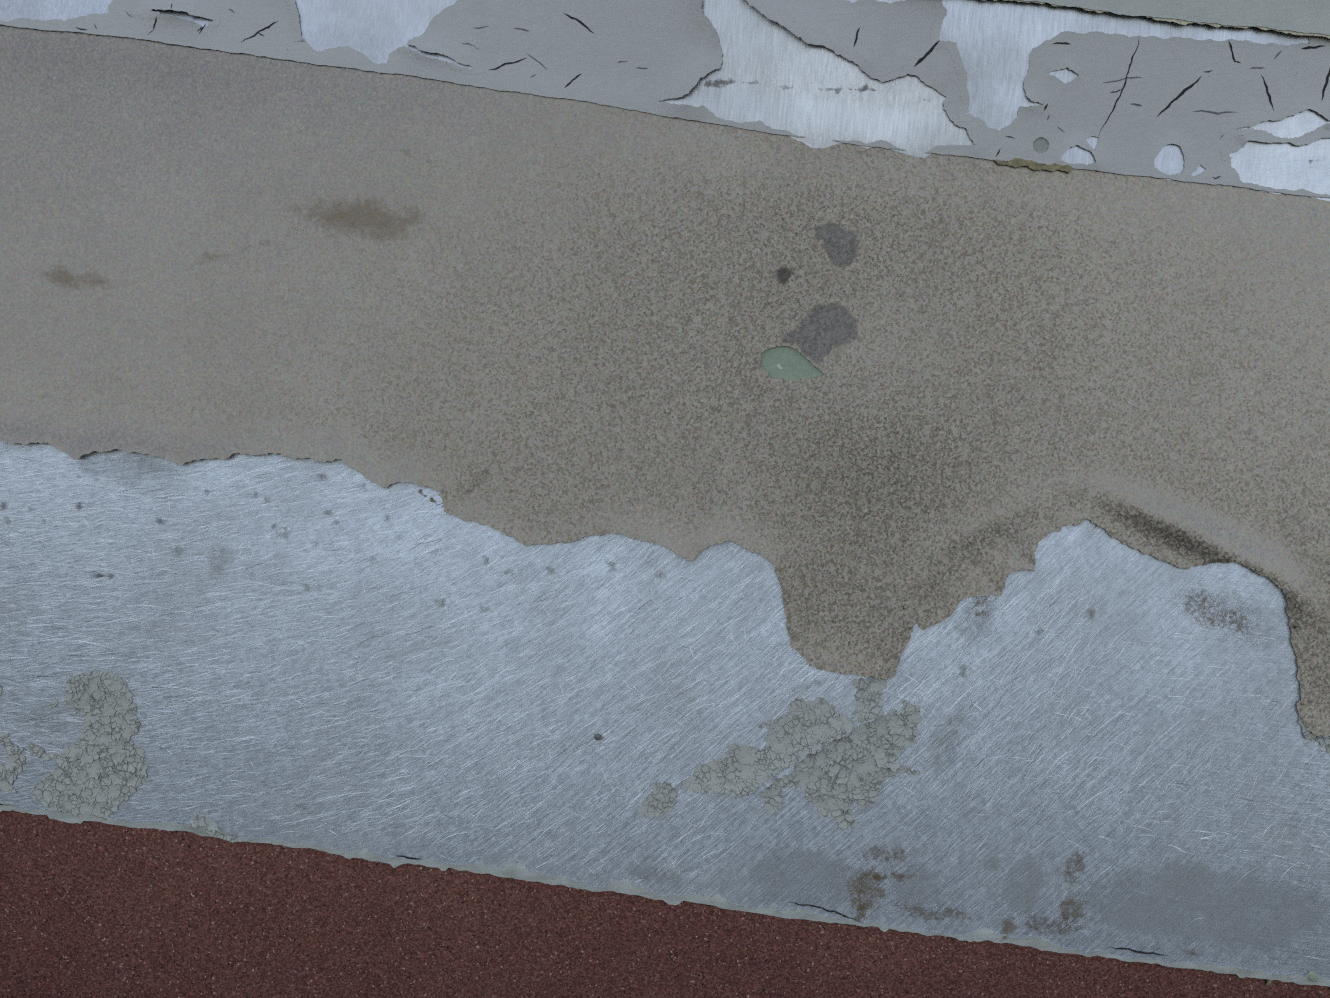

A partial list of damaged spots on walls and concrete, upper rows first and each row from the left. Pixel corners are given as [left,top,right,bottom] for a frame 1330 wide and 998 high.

peeling [0,0,113,25]
peeling [130,0,221,32]
peeling [285,0,485,74]
peeling [662,0,1309,158]
crack [1100,40,1330,139]
spalling [1033,136,1099,169]
spalling [1154,144,1206,180]
peeling [1220,100,1330,201]
peeling [0,415,1330,981]